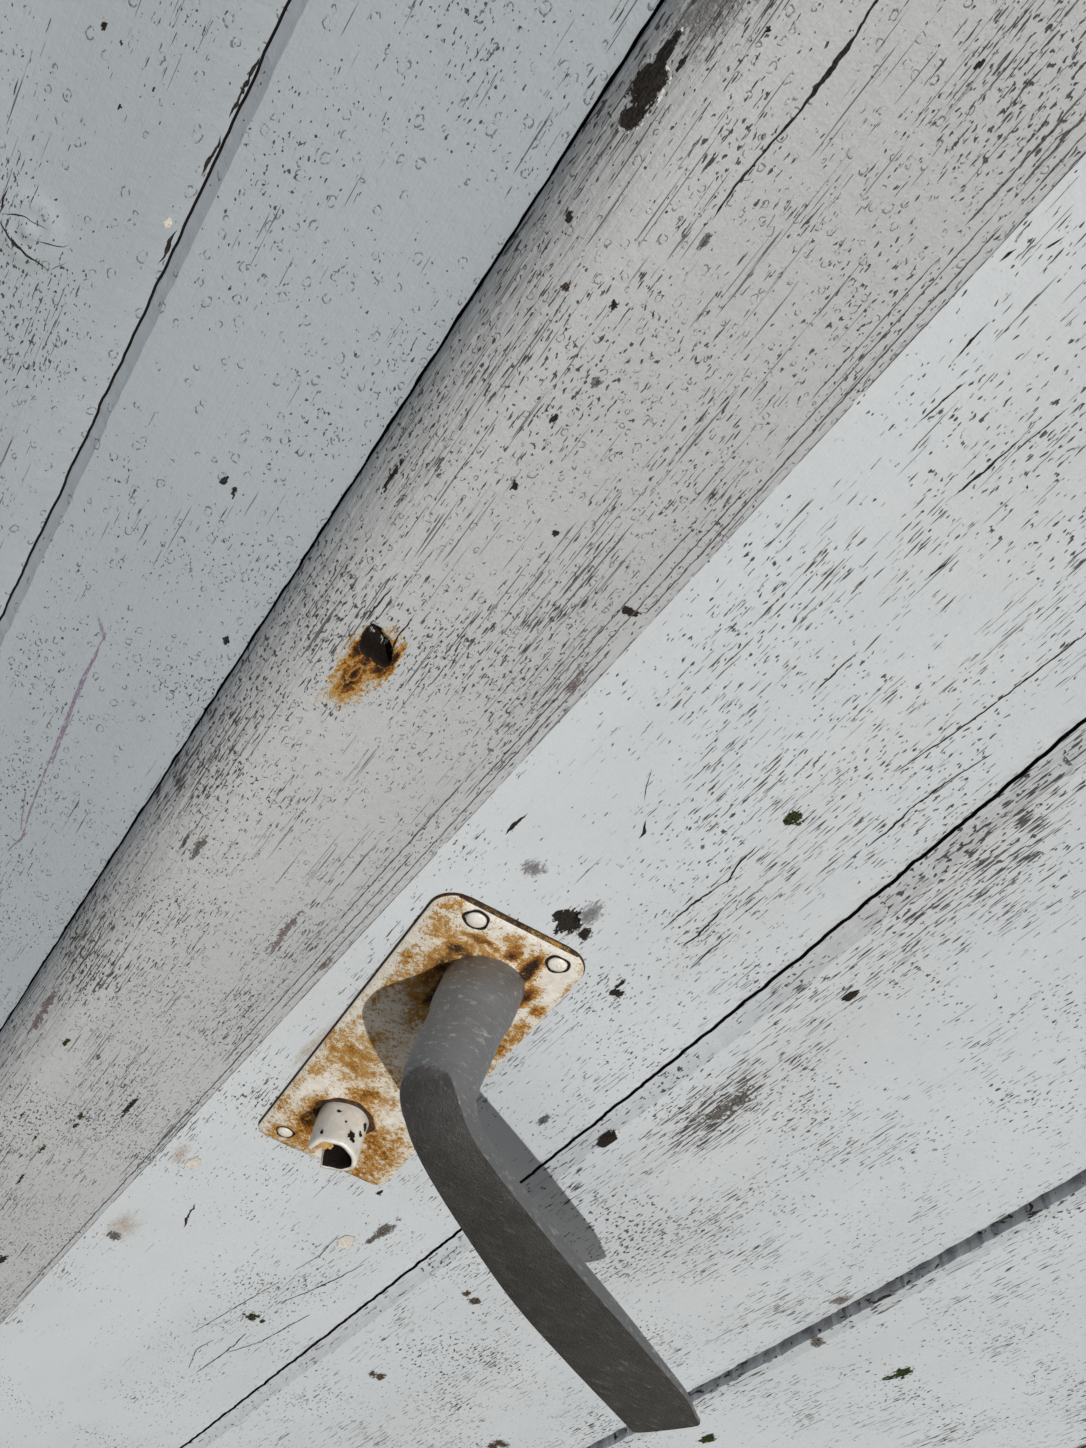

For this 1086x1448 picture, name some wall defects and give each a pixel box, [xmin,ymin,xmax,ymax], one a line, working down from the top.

peeling [617,27,688,134]
crack [713,0,879,219]
corrosion [313,618,408,710]
peeling [551,907,593,942]
corrosion [261,896,584,1185]